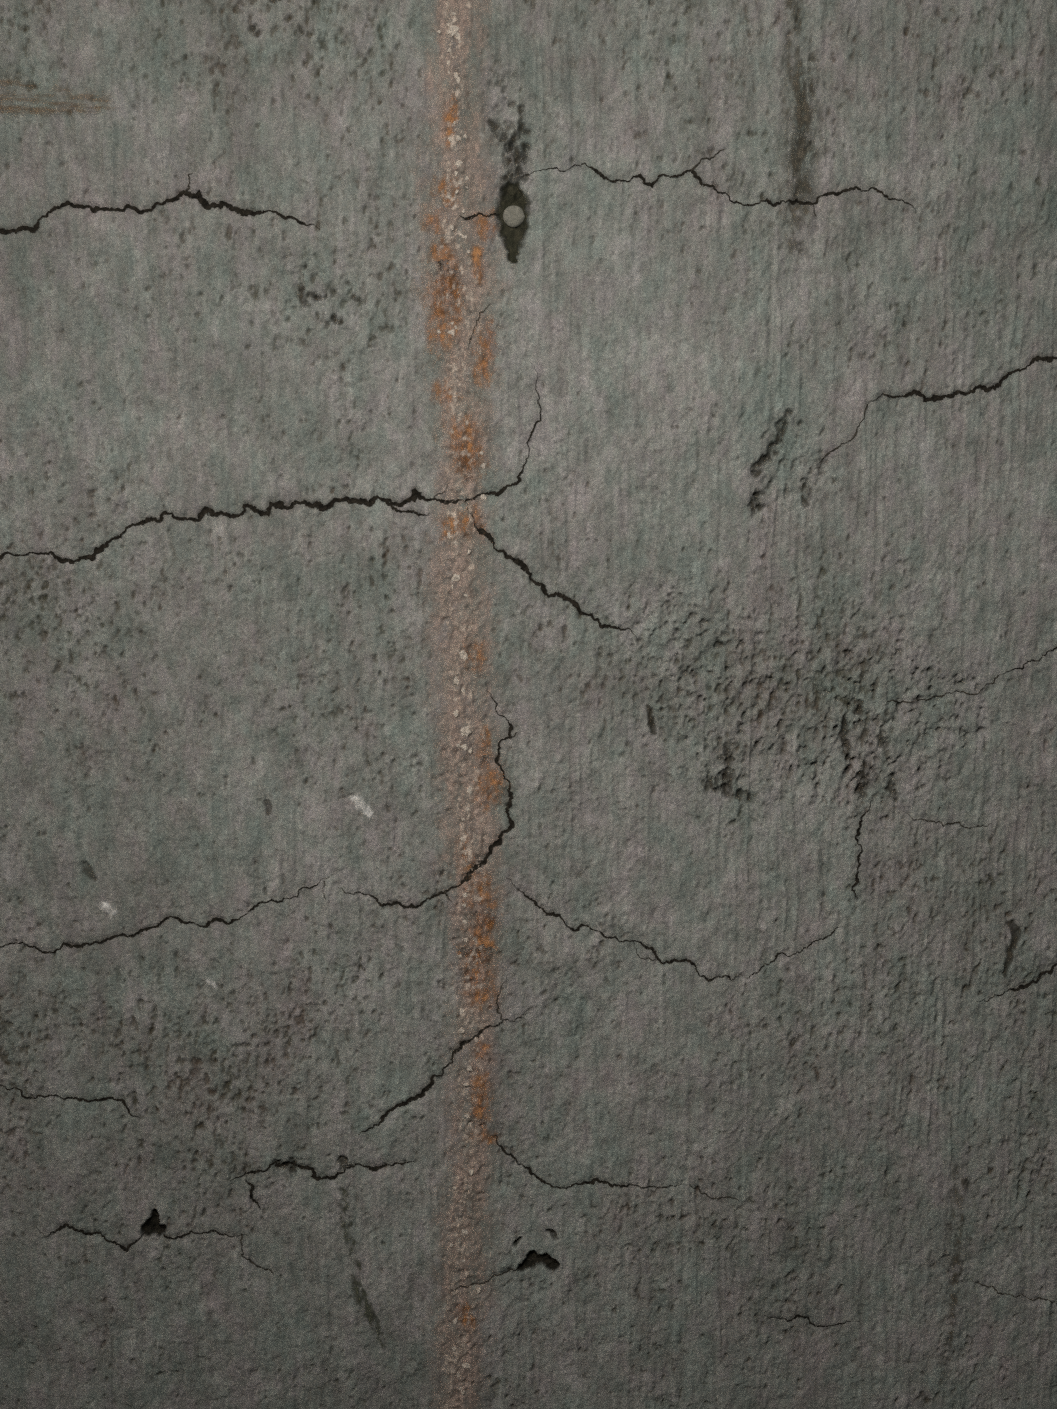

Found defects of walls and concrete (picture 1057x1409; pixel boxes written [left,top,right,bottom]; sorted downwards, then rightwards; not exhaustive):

crack [0,173,311,235]
crack [459,212,501,220]
spalling [488,106,528,184]
crack [514,149,916,215]
crack [816,356,1057,468]
crack [0,367,637,638]
crack [0,680,873,982]
crack [907,813,990,828]
crack [37,974,529,1275]